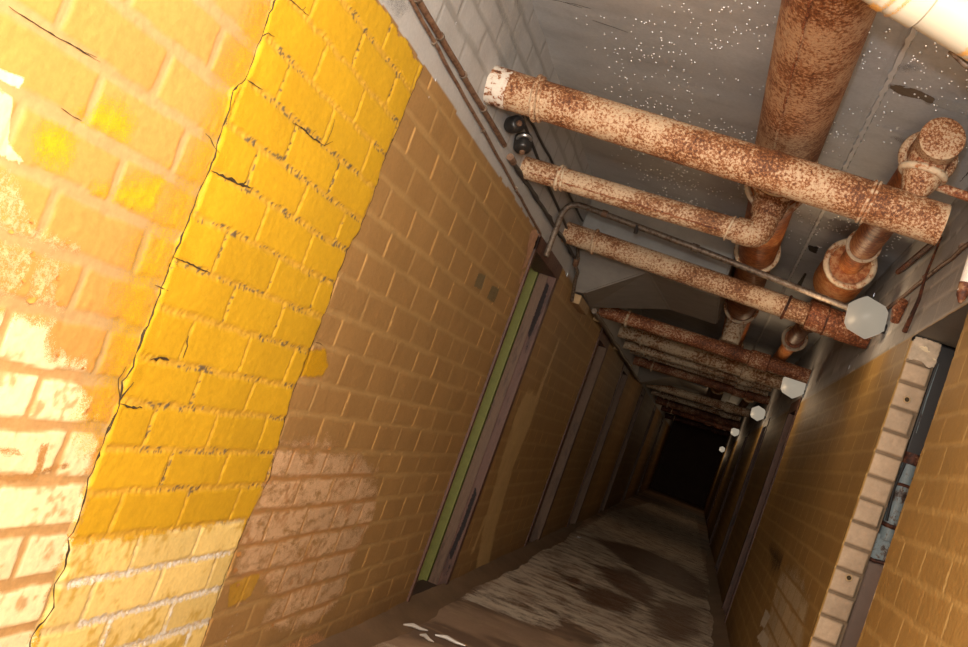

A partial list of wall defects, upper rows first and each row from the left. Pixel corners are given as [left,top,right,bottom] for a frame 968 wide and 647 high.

peeling [0,68,100,647]
crack [10,7,100,62]
crack [29,0,309,647]
crack [293,120,335,146]